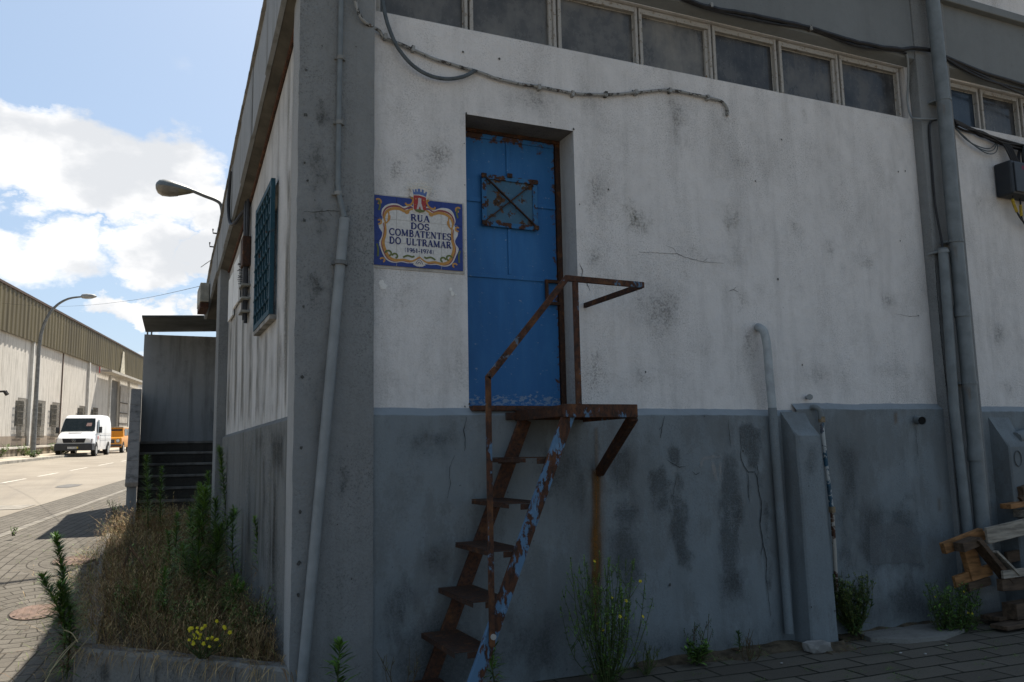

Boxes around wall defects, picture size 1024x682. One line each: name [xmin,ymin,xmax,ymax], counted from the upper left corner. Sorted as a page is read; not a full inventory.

rust [592,473,600,617]
crack [728,421,771,615]